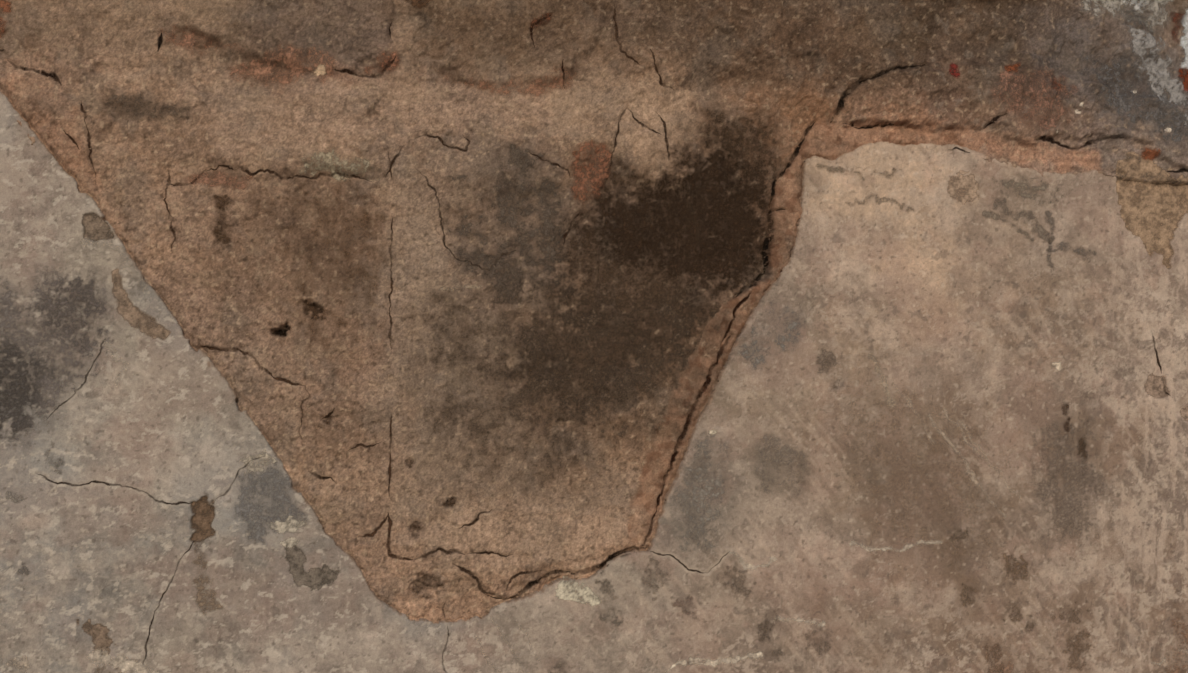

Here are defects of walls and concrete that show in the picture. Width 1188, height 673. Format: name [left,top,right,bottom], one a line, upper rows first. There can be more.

peeling [1083,0,1188,125]
crack [163,134,516,271]
peeling [1116,152,1188,268]
crack [201,346,334,446]
spalling [0,46,962,624]
crack [349,64,925,599]
peeling [1145,374,1169,398]
crack [36,473,192,505]
crack [145,540,196,659]
crack [850,541,940,552]